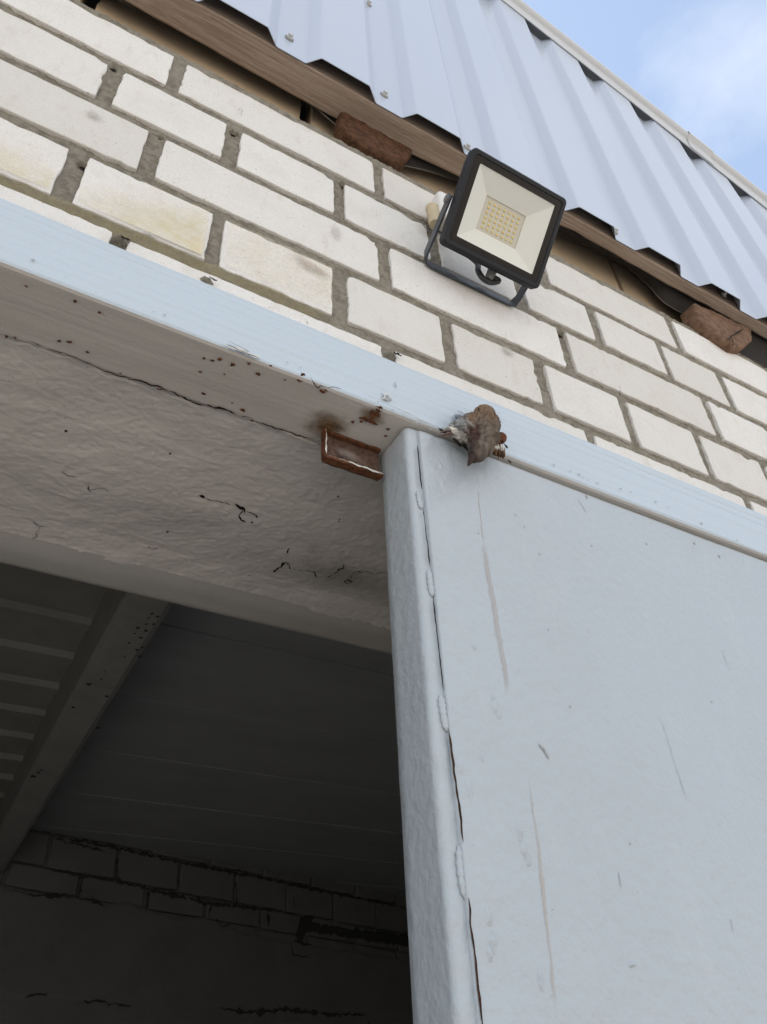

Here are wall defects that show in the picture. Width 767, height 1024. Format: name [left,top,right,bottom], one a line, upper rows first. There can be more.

crack [2,334,320,445]
crack [296,373,340,394]
corrosion [315,406,390,437]
crack [199,495,257,523]
crack [273,548,372,584]